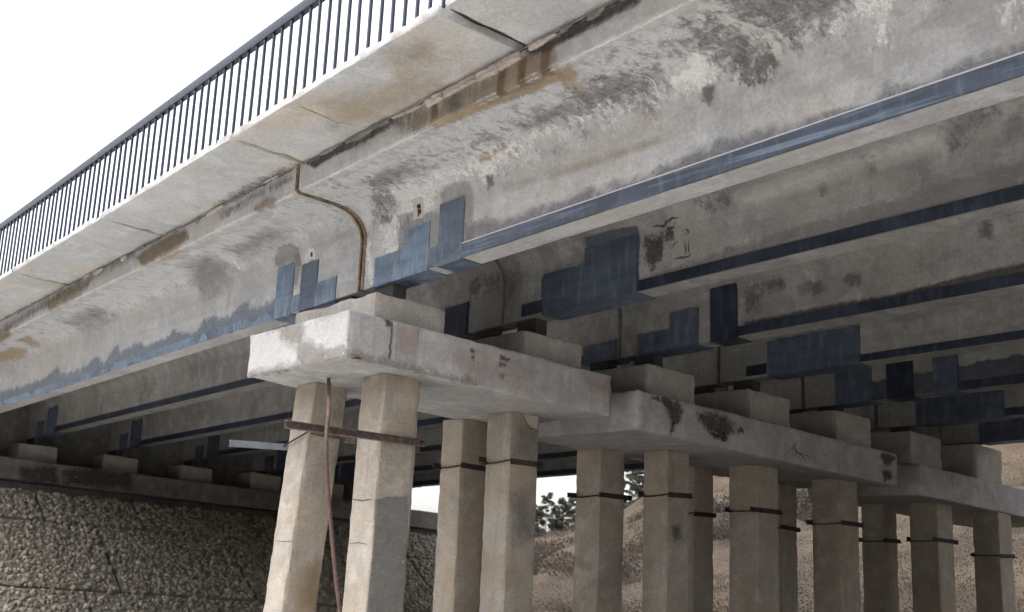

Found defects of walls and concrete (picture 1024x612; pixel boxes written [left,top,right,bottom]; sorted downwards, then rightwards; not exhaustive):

rust [400,47,577,130]
damp [0,0,933,364]
damp [248,330,297,372]
crack [385,319,393,360]